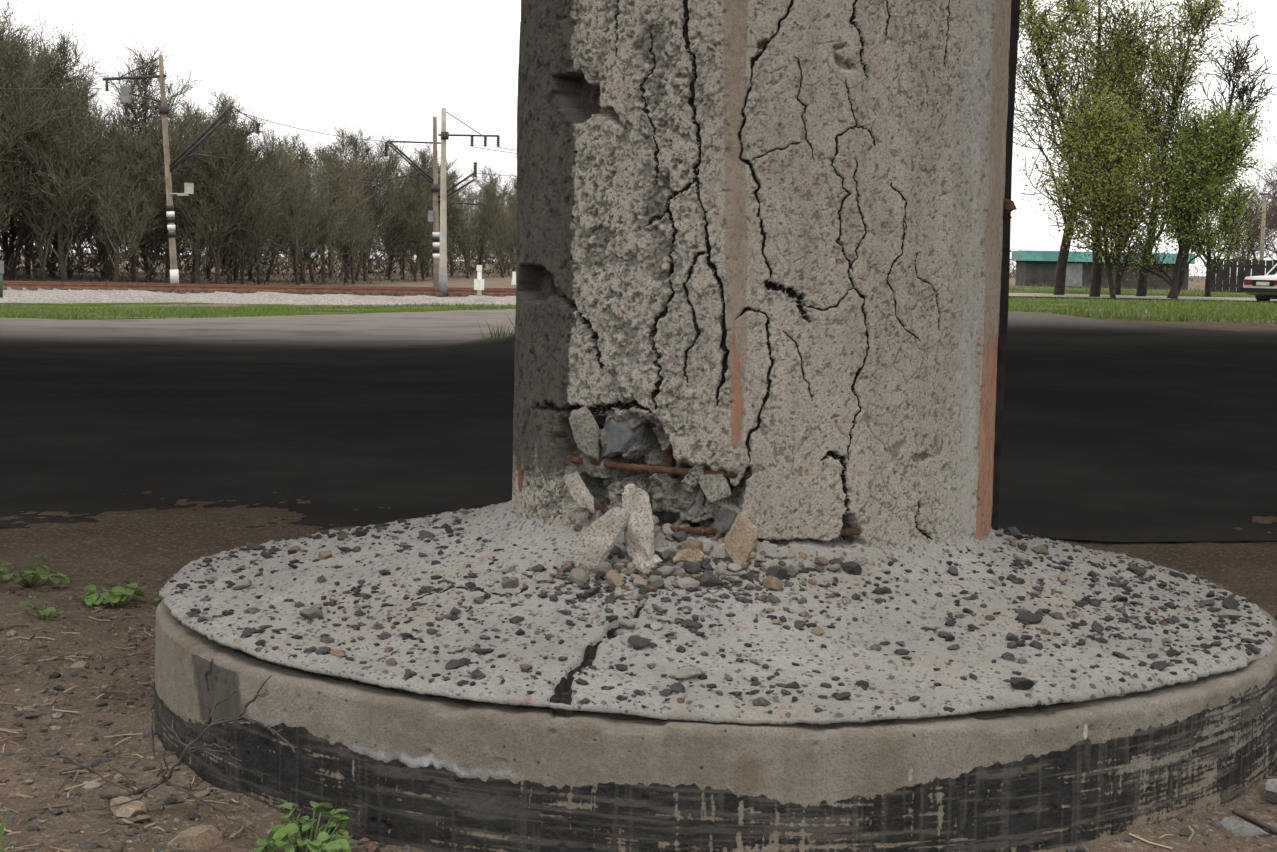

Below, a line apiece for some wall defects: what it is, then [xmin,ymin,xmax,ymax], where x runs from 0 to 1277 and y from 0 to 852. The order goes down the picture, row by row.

crack [943,0,951,67]
crack [536,0,940,540]
spalling [563,412,749,538]
corrosion [731,339,742,444]
corrosion [975,343,998,540]
water stain [192,654,246,724]
crack [205,604,646,718]
efflorescence [402,756,465,775]